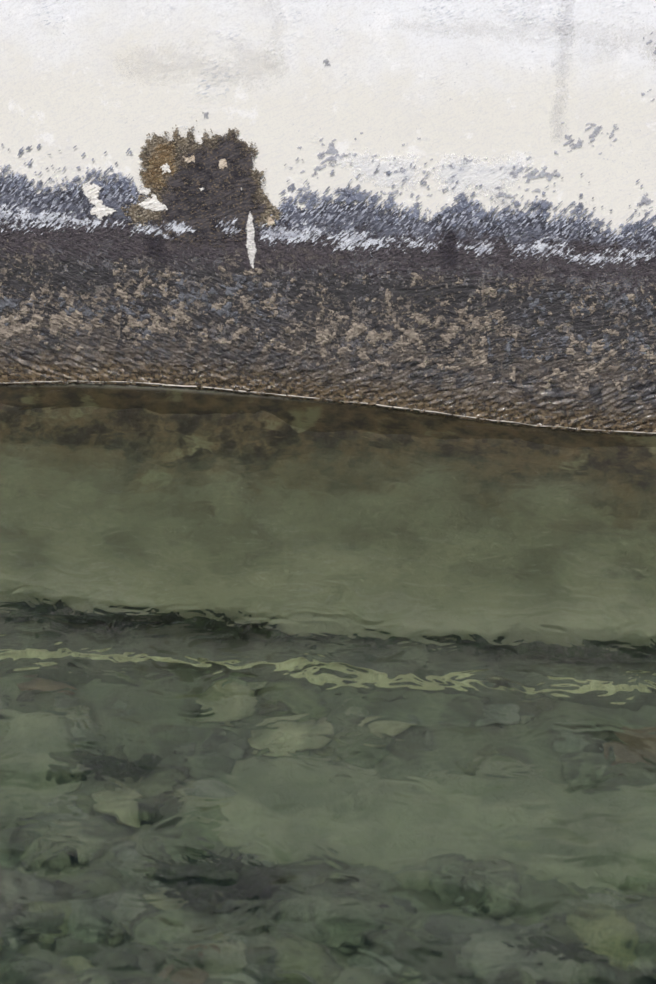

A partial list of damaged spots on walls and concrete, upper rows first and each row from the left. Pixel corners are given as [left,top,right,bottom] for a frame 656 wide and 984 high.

peeling [83,183,116,220]
peeling [0,213,656,391]